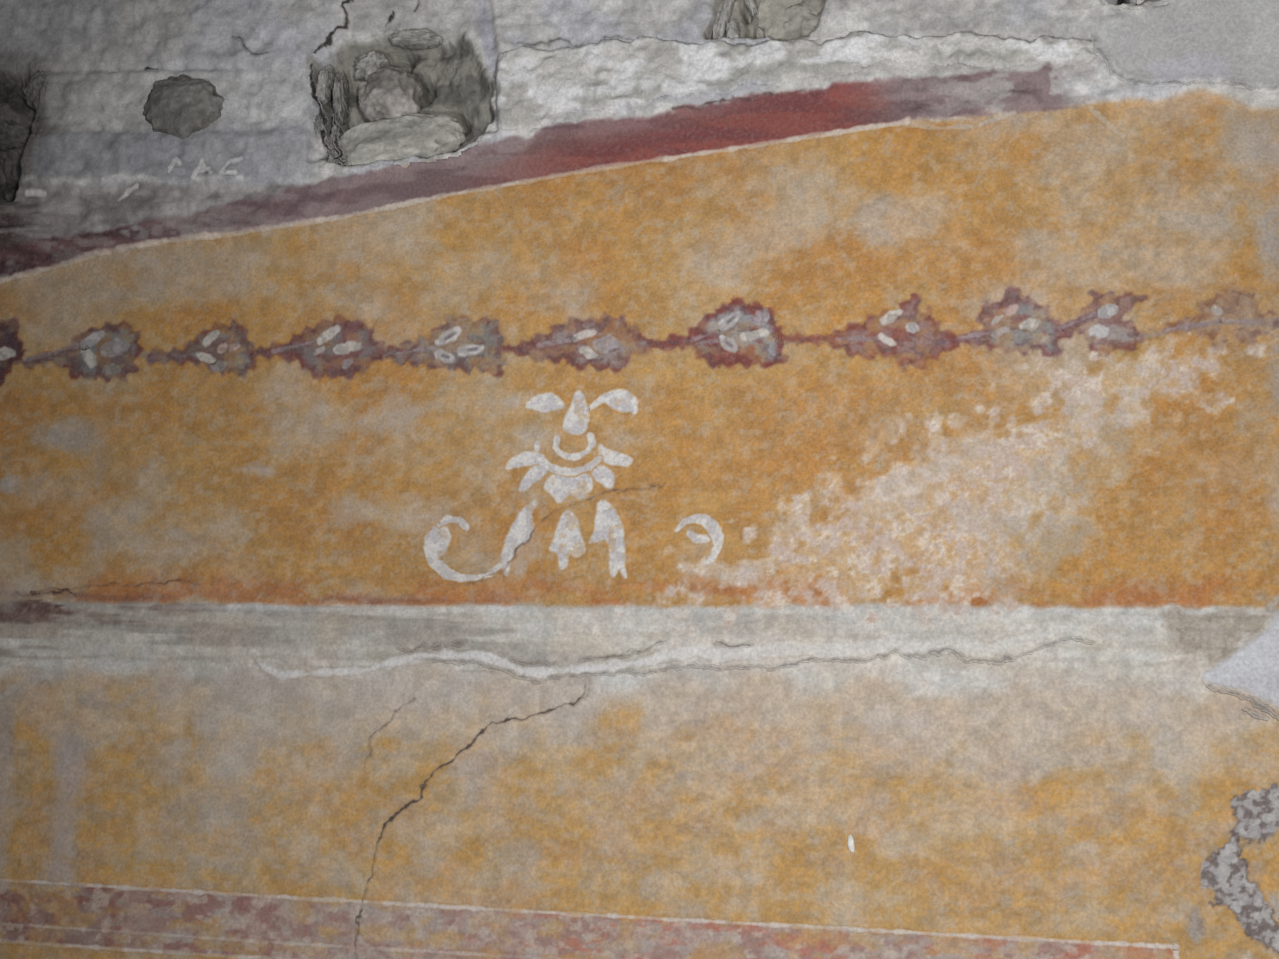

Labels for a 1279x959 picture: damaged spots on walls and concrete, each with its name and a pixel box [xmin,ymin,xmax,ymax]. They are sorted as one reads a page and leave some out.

crack [309,0,355,165]
crack [385,0,421,27]
spalling [1156,588,1279,667]
crack [354,635,1094,959]
spalling [1173,782,1279,959]